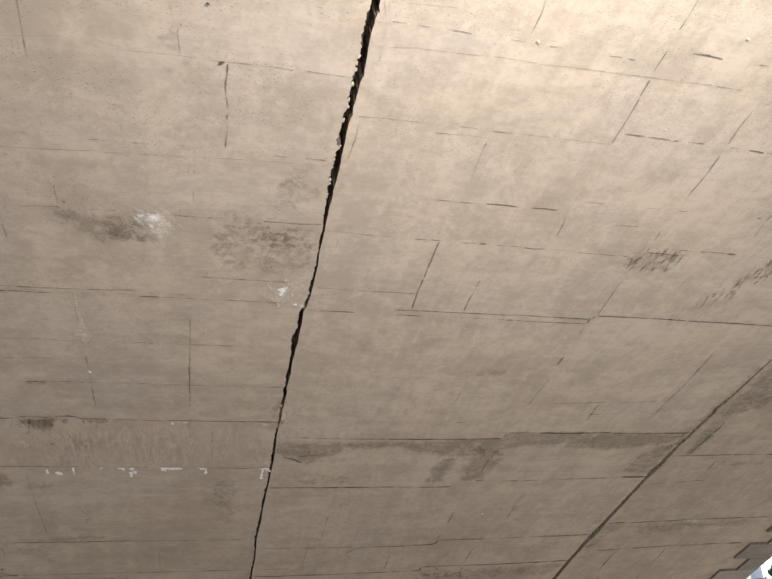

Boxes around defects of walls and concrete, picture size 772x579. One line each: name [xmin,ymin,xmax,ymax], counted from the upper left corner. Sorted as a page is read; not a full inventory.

damp [134,213,172,238]
crack [229,0,428,579]
crack [404,310,769,326]
crack [389,435,468,443]
crack [552,360,771,579]